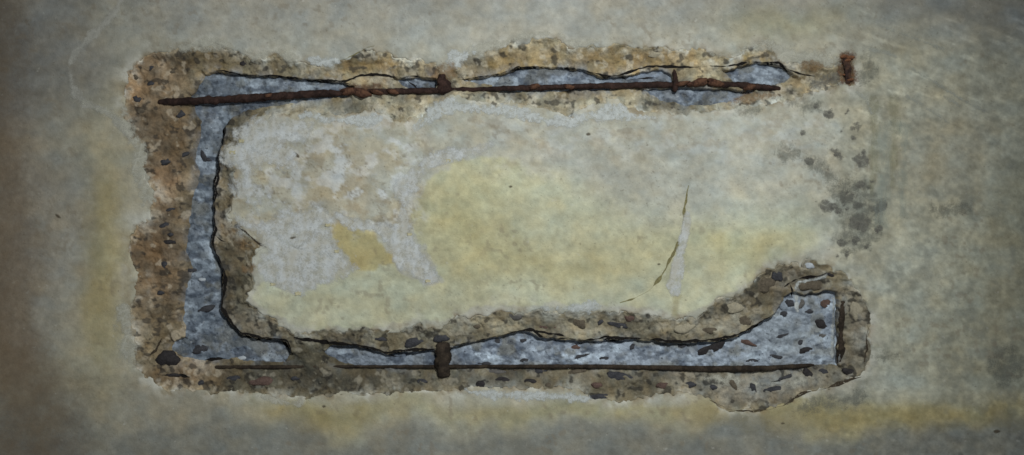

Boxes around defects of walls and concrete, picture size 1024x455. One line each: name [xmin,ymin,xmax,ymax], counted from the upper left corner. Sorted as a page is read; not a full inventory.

crack [217,46,812,88]
crack [211,124,773,357]
spalling [122,38,871,412]
crack [784,273,827,296]
spalling [821,191,887,243]
crack [710,294,868,412]